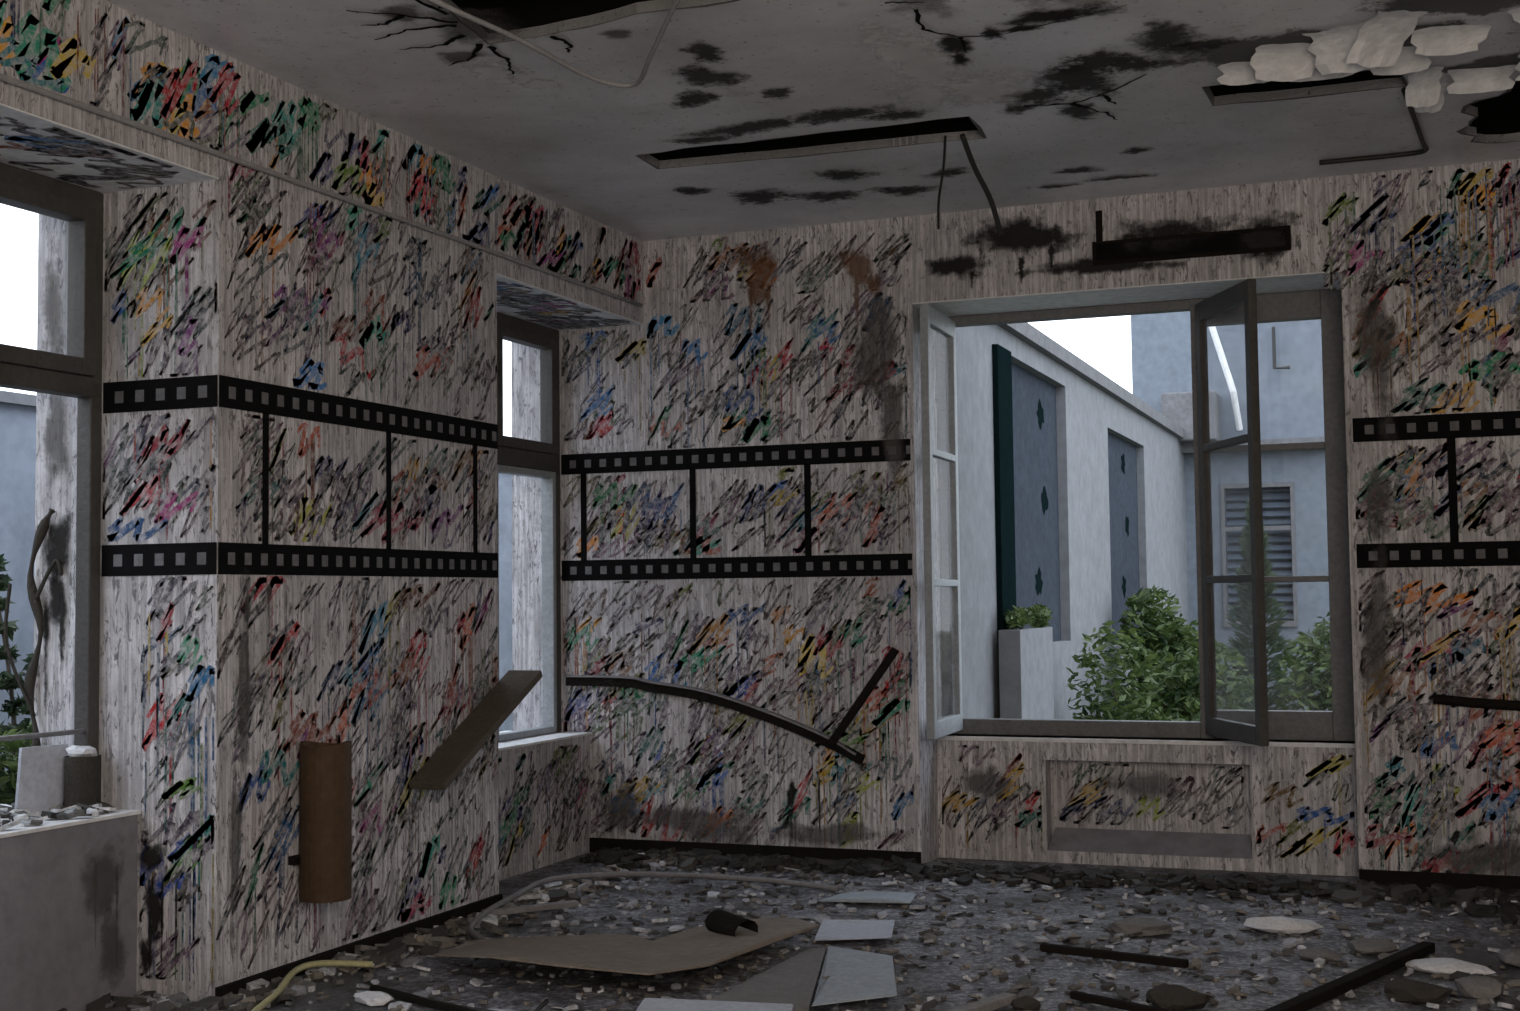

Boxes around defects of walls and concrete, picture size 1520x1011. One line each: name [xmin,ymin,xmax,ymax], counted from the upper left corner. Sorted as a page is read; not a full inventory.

leakage [673,20,1236,144]
peeling [1159,0,1520,113]
leakage [43,594,65,714]